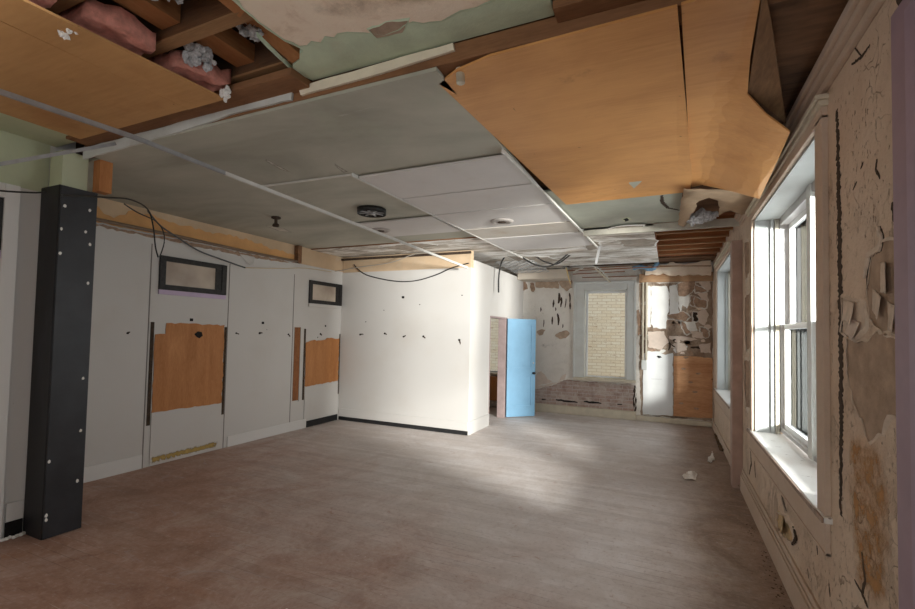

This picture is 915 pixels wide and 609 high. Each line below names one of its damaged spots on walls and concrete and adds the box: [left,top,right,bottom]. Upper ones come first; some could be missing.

peeling [235,0,498,47]
peeling [615,238,659,247]
flaking render [535,281,713,422]
flaking render [839,237,896,445]